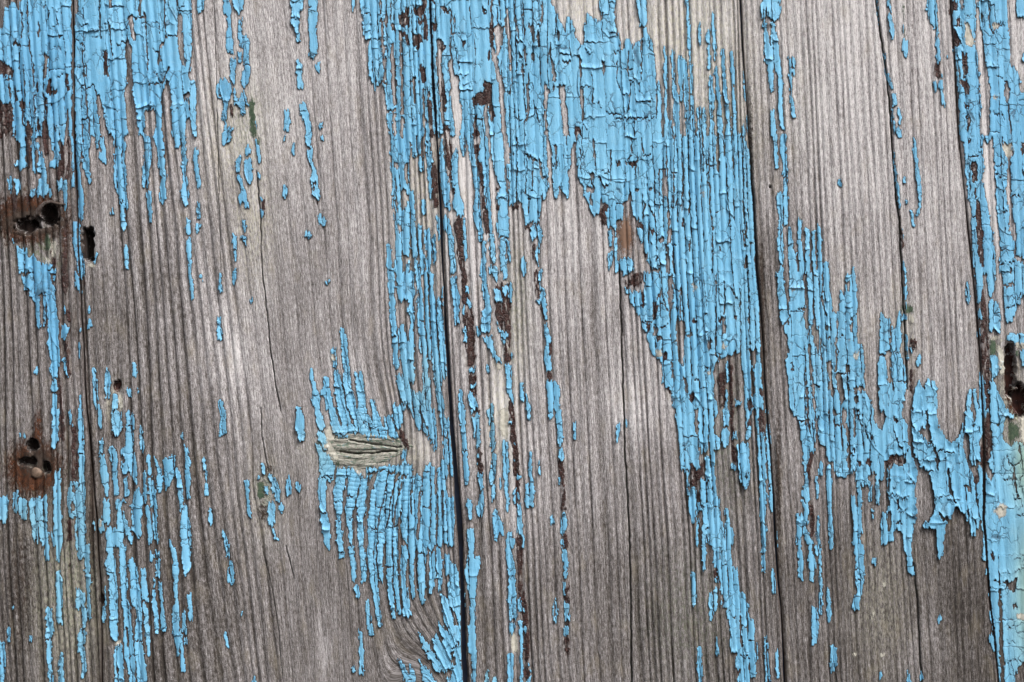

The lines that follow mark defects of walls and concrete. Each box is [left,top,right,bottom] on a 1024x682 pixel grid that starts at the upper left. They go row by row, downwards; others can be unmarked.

rust [0,412,69,513]
rust [0,192,72,261]
peeling [0,0,205,301]
peeling [0,238,235,682]
peeling [216,0,264,293]
crack [257,177,281,470]
peeling [244,463,301,541]
peeling [283,0,327,239]
peeling [295,0,780,682]
crack [875,0,907,387]
peeling [760,0,1024,682]